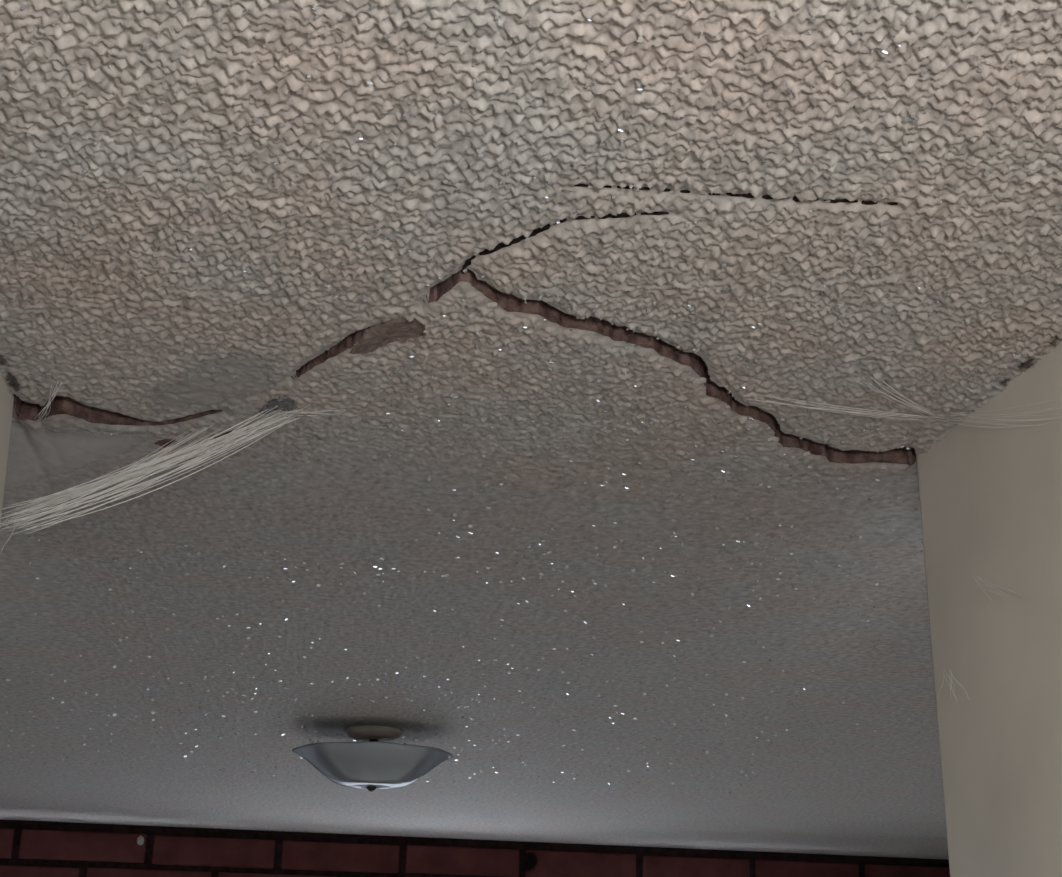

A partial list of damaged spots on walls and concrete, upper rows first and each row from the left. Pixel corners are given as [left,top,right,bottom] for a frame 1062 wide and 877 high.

crack [291,325,374,379]
crack [423,184,915,465]
crack [0,355,254,448]
peeling [259,396,297,415]